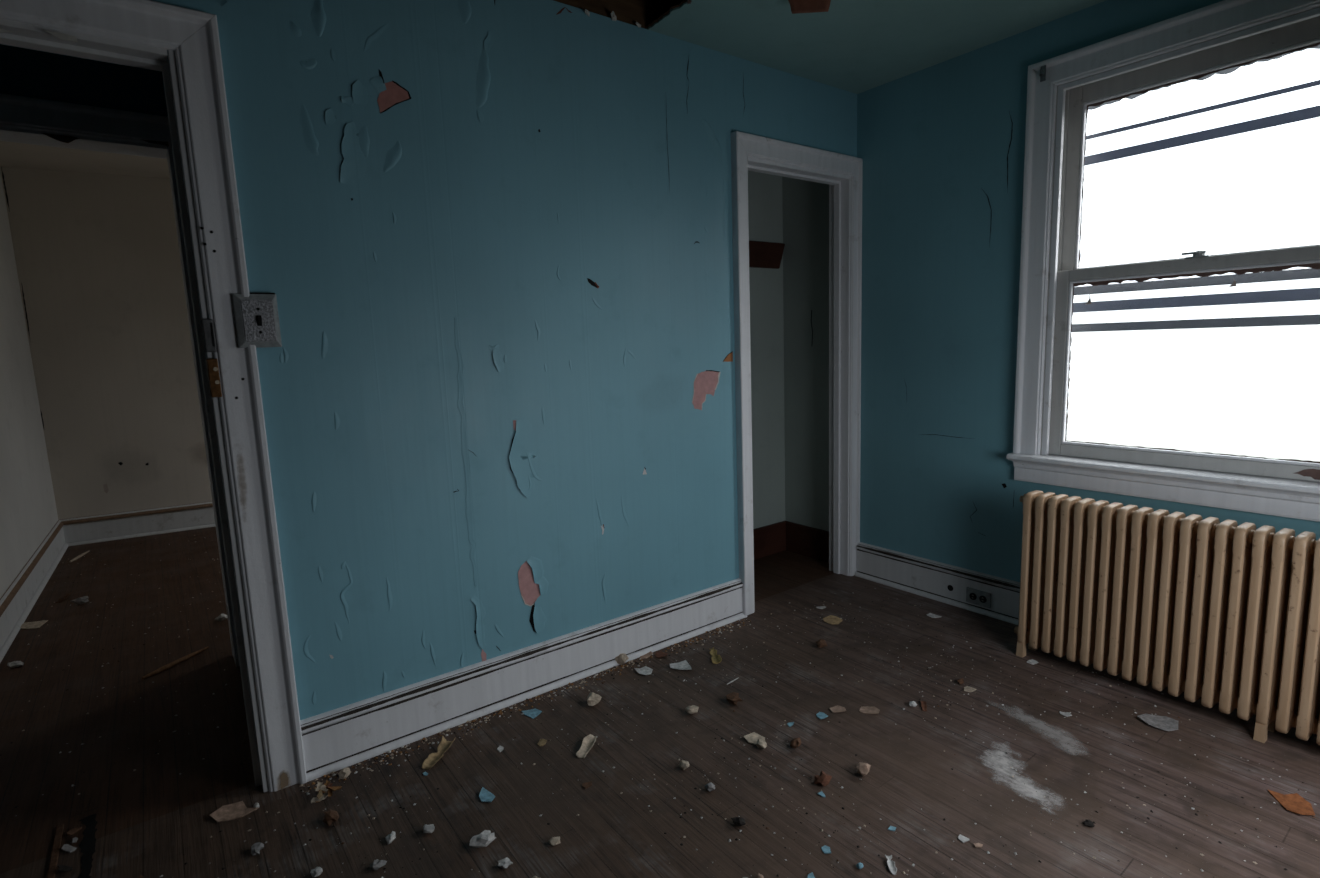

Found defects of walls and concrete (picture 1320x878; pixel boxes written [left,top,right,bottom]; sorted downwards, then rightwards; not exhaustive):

peeling [377,80,411,114]
peeling [692,351,733,410]
peeling [518,556,549,607]